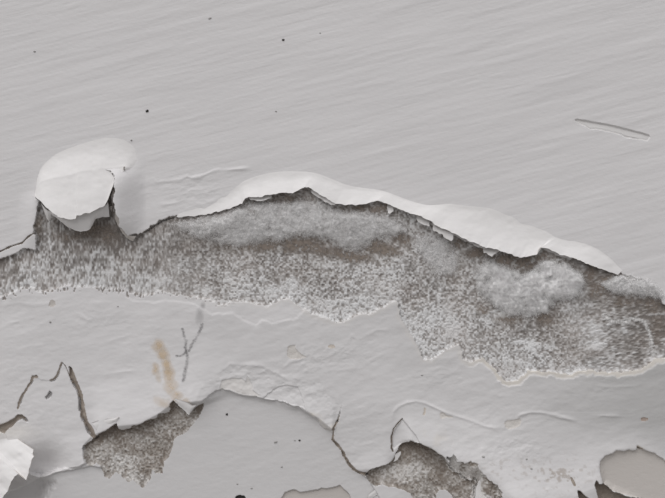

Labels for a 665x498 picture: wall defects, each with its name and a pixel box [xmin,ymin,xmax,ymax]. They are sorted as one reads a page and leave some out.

spalling [0,186,665,382]
water stain [467,248,665,325]
crack [0,362,96,438]
peeling [0,362,351,498]
crack [331,415,366,476]
spalling [365,441,502,498]
peeling [595,445,665,498]